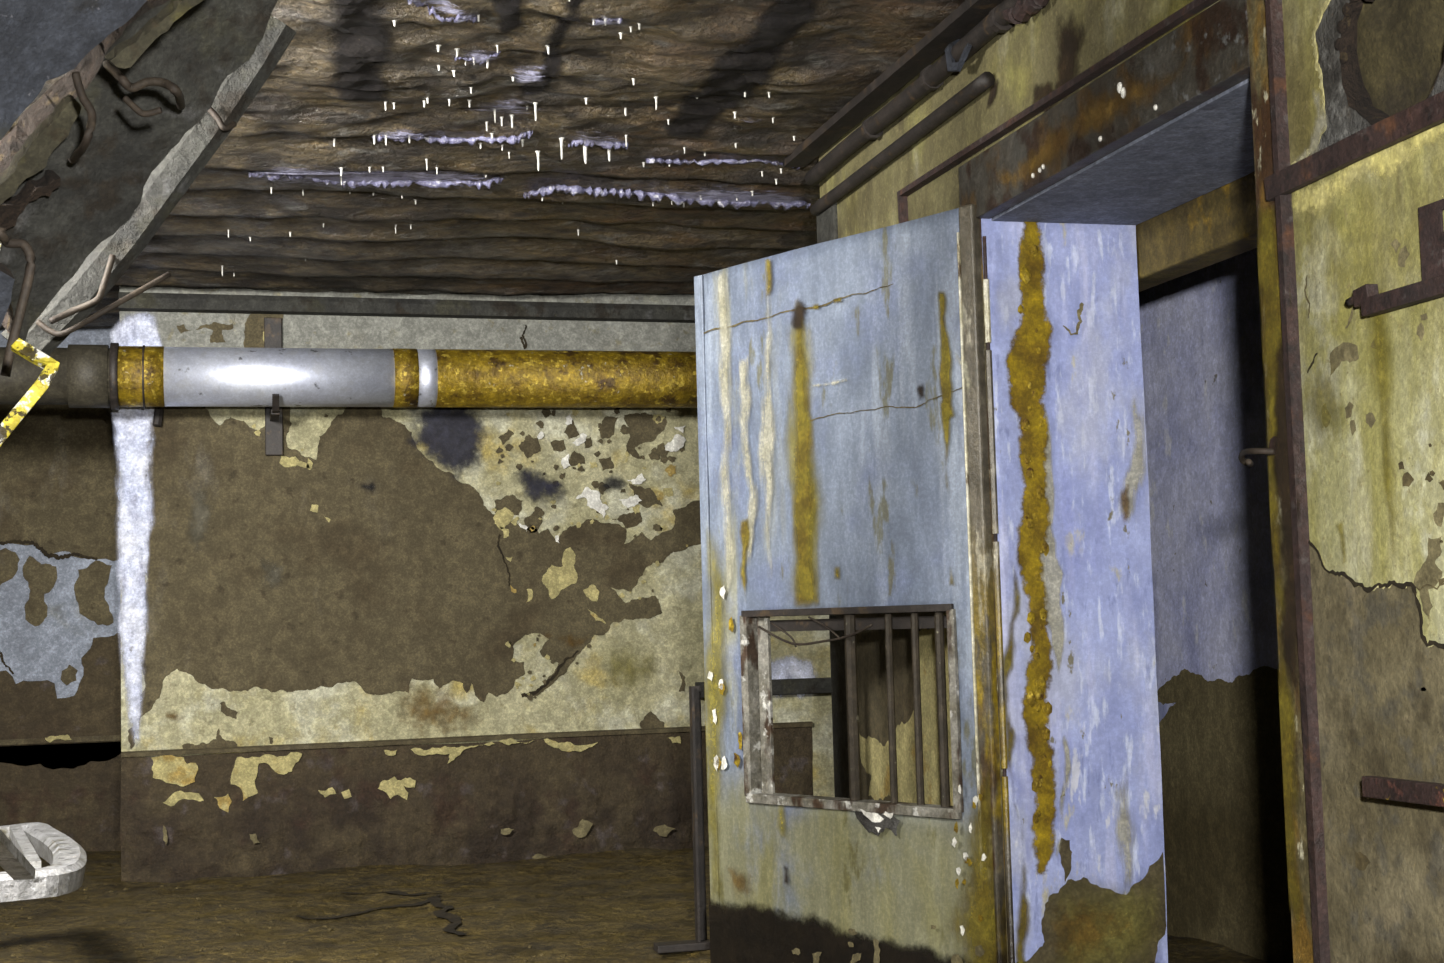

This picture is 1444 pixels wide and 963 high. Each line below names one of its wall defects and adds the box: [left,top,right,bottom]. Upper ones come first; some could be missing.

water stain [407,0,478,24]
efflorescence [248,168,504,191]
efflorescence [371,102,533,146]
corrosion [790,298,841,605]
corrosion [938,292,953,456]
peeling [0,404,701,769]
corrosion [1004,222,1056,963]
crack [1416,578,1444,590]
peeling [1308,461,1444,963]
peeling [163,791,232,812]
peeling [1025,666,1293,963]
water stain [709,900,985,963]